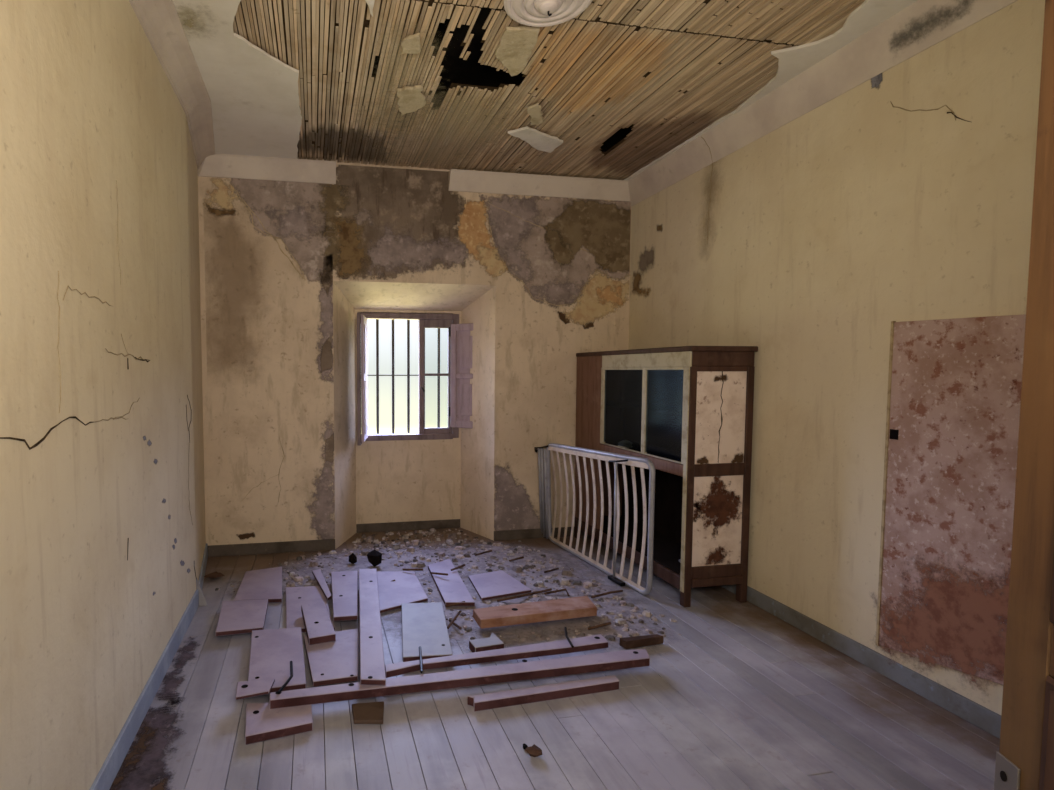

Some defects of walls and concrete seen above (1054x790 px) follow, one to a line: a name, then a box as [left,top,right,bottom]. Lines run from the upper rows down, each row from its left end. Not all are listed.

leakage [892,0,969,47]
spalling [233,0,865,180]
crack [890,101,970,122]
crack [0,180,139,450]
crack [105,334,150,369]
peeling [203,178,334,382]
peeling [458,195,631,325]